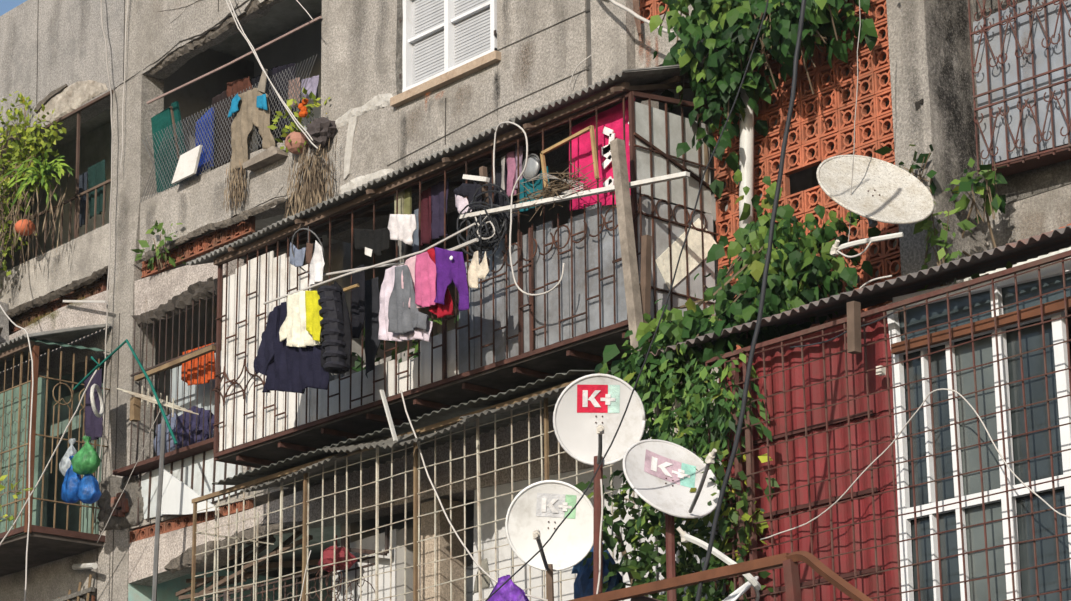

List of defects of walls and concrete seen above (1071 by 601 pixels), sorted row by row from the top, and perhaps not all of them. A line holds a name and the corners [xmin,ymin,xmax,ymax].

spalling [34,80,108,123]
peeling [335,0,403,194]
water stain [931,0,976,172]